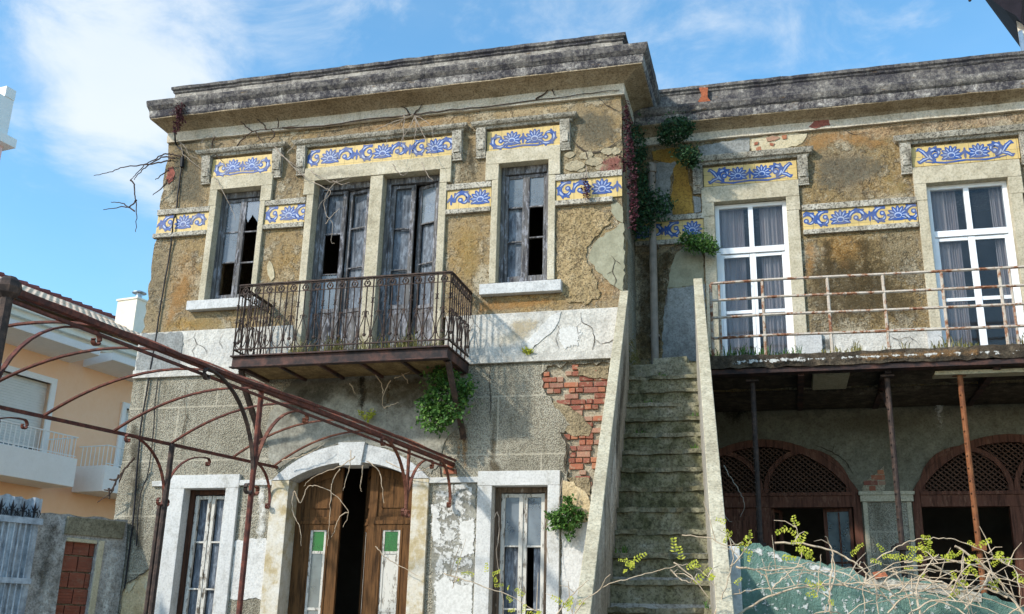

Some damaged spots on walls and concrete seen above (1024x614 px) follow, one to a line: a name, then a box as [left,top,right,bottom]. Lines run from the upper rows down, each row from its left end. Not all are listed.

flaking render [562,141,623,174]
flaking render [751,120,830,151]
damp [812,240,912,319]
flaking render [542,362,610,614]
peeling [430,462,475,614]